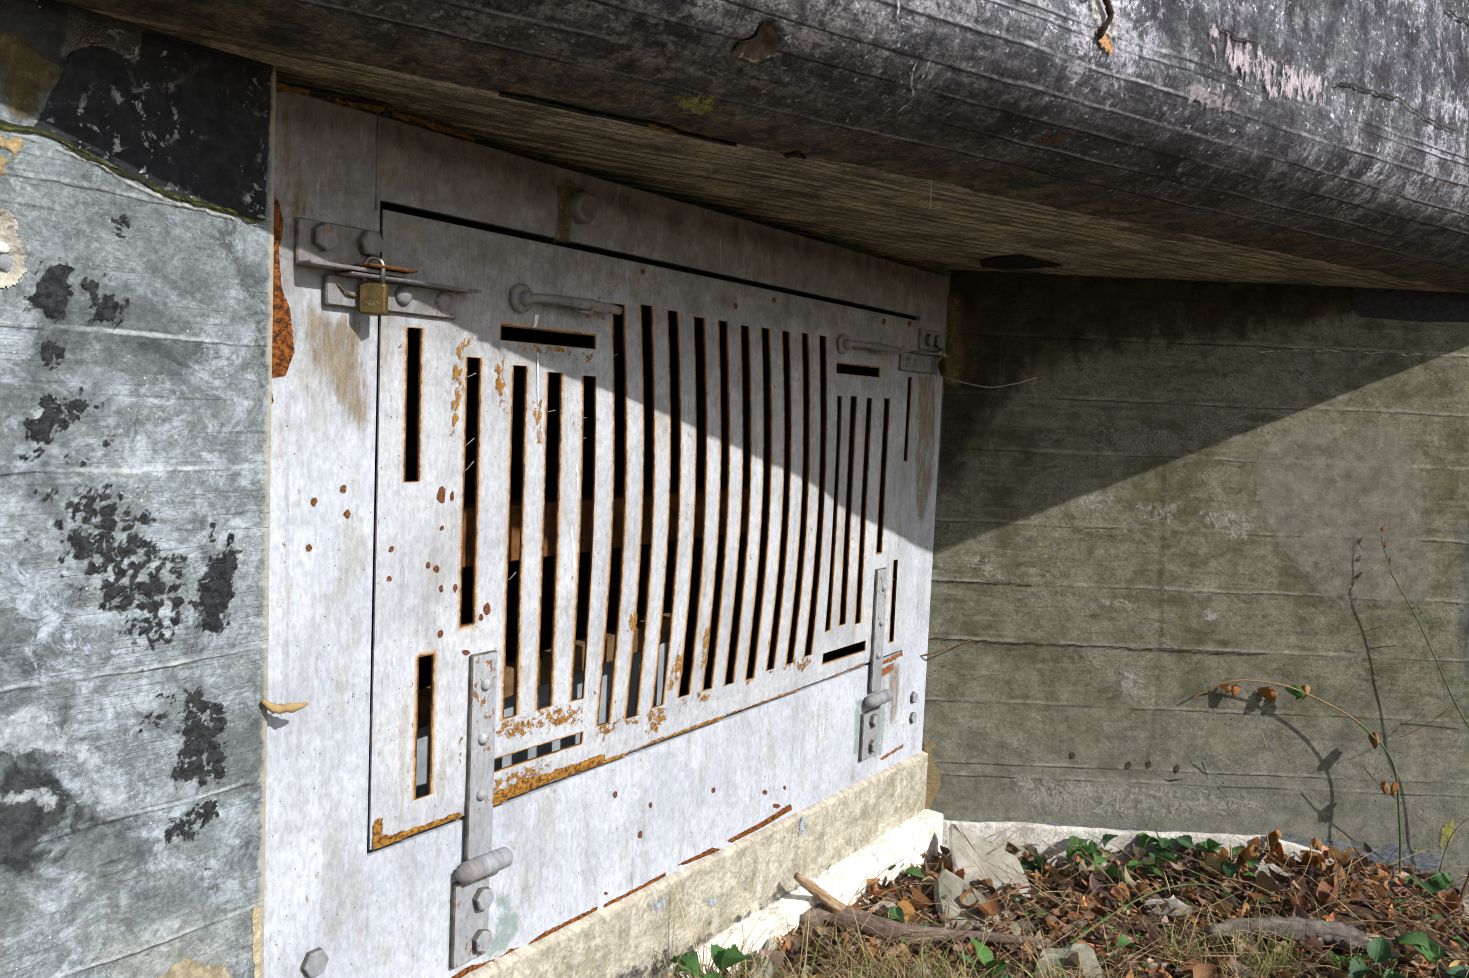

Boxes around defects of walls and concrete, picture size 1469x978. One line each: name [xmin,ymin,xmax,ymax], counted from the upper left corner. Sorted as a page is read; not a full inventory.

corrosion [1097,28,1114,55]
peeling [0,135,24,154]
peeling [111,202,131,240]
peeling [0,208,130,370]
corrosion [272,152,305,403]
corrosion [310,309,366,421]
peeling [17,386,243,652]
corrosion [627,610,637,643]
peeling [137,686,230,843]
corrosion [493,628,812,806]
corrosion [822,652,903,720]
corrosion [373,812,462,850]